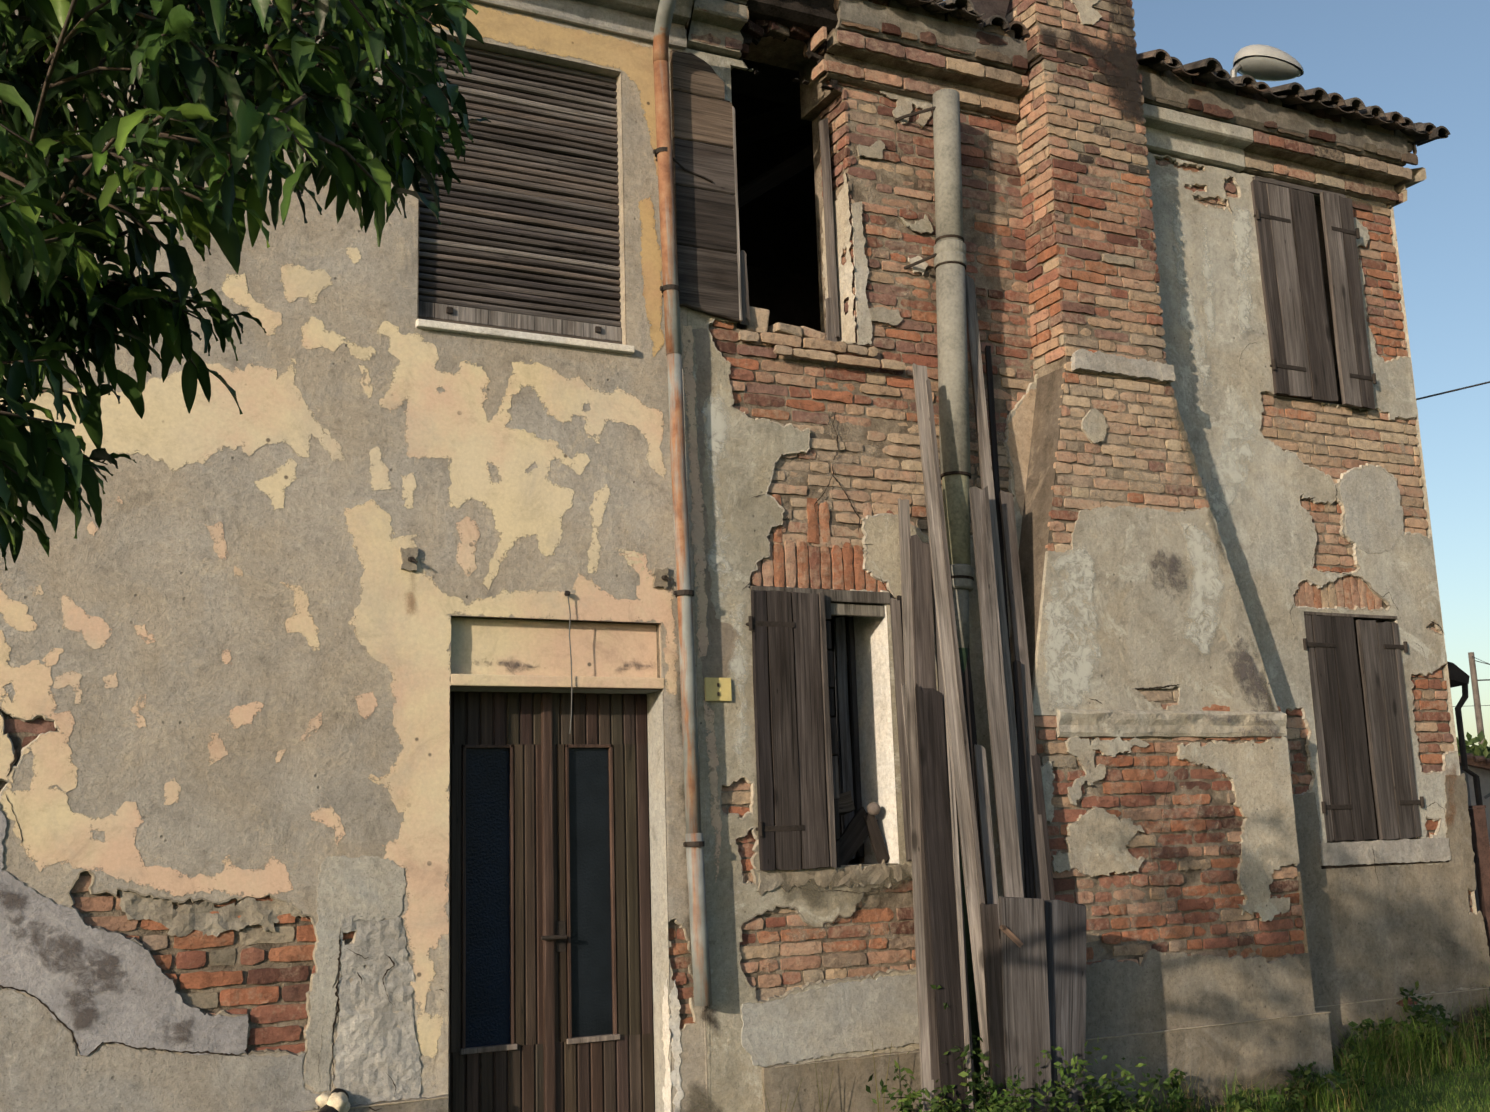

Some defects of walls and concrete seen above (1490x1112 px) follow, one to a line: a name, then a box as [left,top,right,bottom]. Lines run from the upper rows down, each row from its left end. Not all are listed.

peeling [465,4,658,175]
flaking render [638,78,943,679]
flaking render [960,109,1037,516]
flaking render [1259,389,1432,612]
peeling [0,263,679,1059]
peeling [703,700,759,886]
flaking render [1034,706,1316,965]
leakage [0,891,123,1029]
crack [0,985,241,1057]
leakage [170,1020,192,1042]
crack [318,928,395,1109]
flaking render [738,876,916,1003]